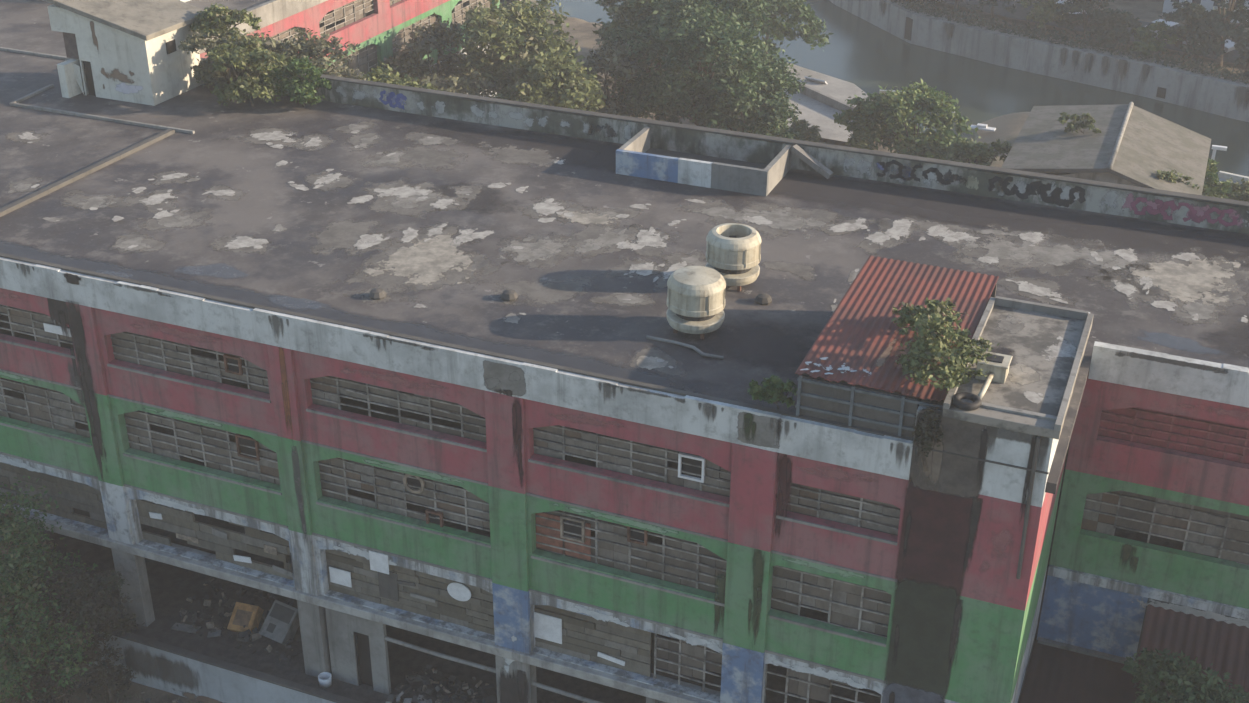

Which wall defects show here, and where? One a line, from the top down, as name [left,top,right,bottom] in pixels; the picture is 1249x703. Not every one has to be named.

spalling [101,68,134,89]
peeling [226,121,1249,325]
leakage [47,298,106,478]
leakage [0,241,797,439]
spalling [483,360,526,396]
leakage [688,322,820,377]
leakage [496,389,523,485]
leakage [775,454,792,533]
leakage [748,549,764,636]
leakage [882,408,1049,703]
leakage [124,647,223,703]
leakage [499,670,528,703]